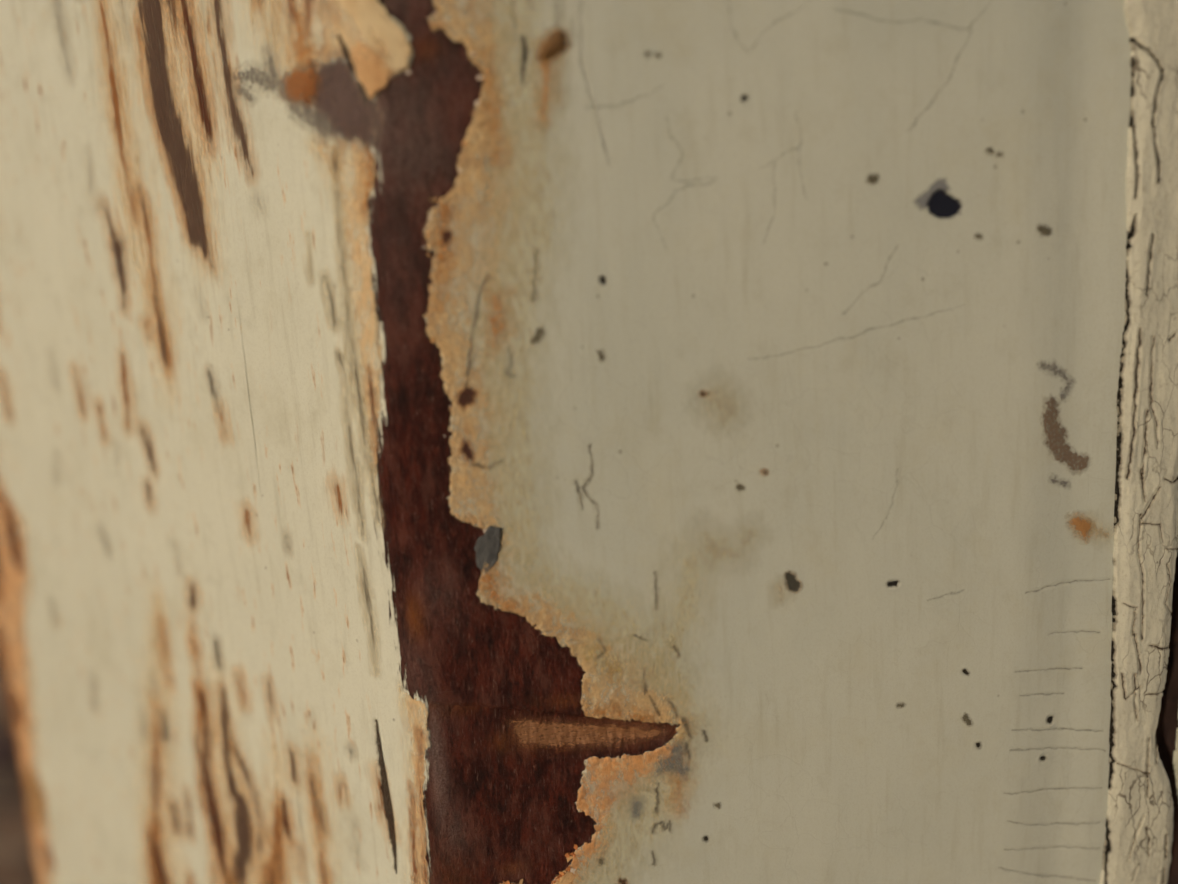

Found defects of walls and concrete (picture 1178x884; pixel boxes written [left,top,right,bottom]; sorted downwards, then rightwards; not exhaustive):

rust [100,0,172,370]
rust [120,352,156,504]
rust [136,0,213,268]
rust [214,0,254,178]
rust [318,139,382,473]
peeling [305,0,680,884]
rust [423,0,687,884]
crack [1103,38,1178,884]
rust [0,490,54,884]
rust [147,625,303,884]
rust [289,750,327,884]
rust [406,696,428,884]